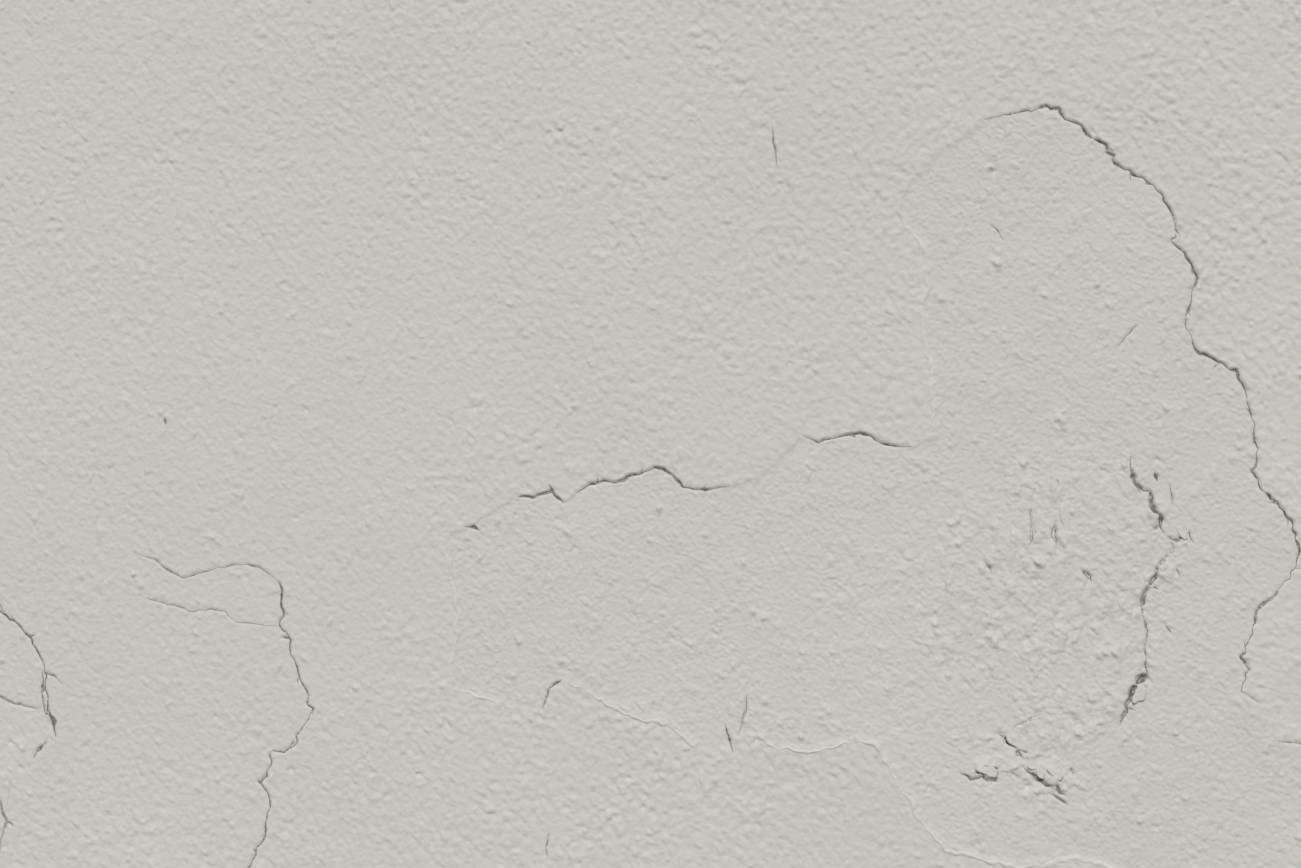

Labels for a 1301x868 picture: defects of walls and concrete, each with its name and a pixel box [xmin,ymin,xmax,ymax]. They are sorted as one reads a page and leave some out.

crack [517,466,730,503]
crack [804,433,910,447]
crack [988,105,1301,725]
crack [0,605,61,757]
crack [139,554,314,868]
crack [0,800,13,850]